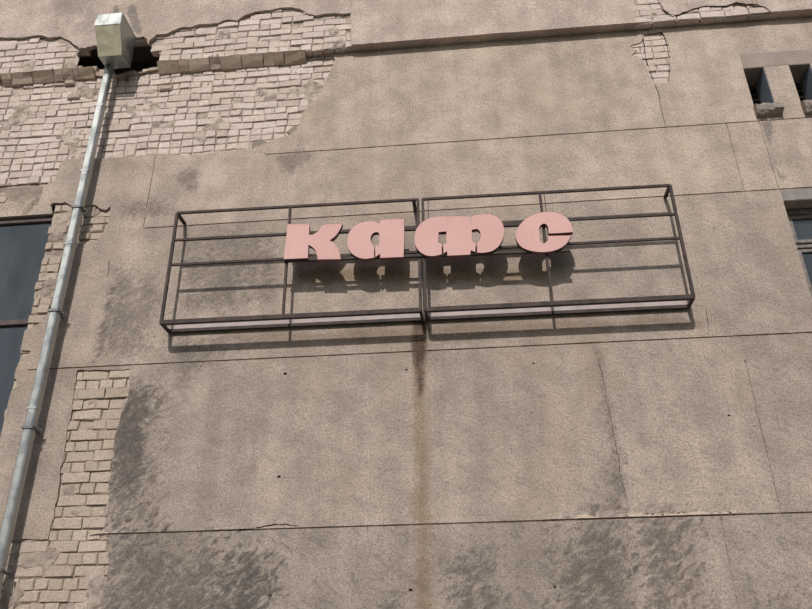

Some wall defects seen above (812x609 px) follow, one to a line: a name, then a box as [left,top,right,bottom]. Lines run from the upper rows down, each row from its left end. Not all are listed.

spalling [0,9,353,215]
spalling [631,0,773,85]
crack [642,1,771,128]
spalling [27,202,73,329]
spalling [76,206,111,244]
spalling [0,365,143,609]
water stain [105,530,274,609]